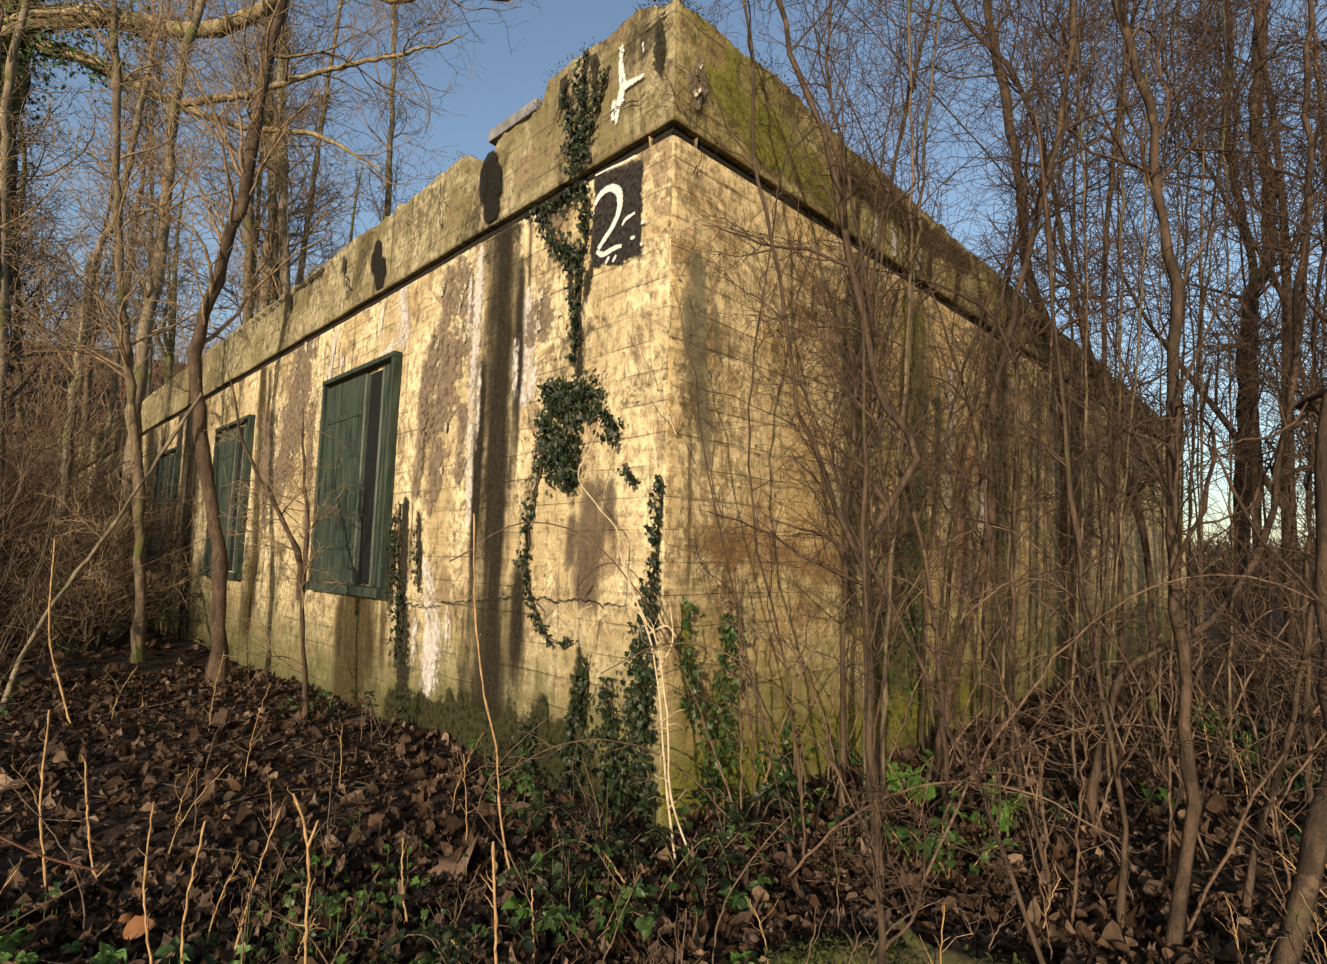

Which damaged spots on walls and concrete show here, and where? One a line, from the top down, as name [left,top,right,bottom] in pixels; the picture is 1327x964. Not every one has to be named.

damp [371,240,386,290]
damp [379,286,410,354]
damp [461,150,537,723]
damp [333,496,450,710]